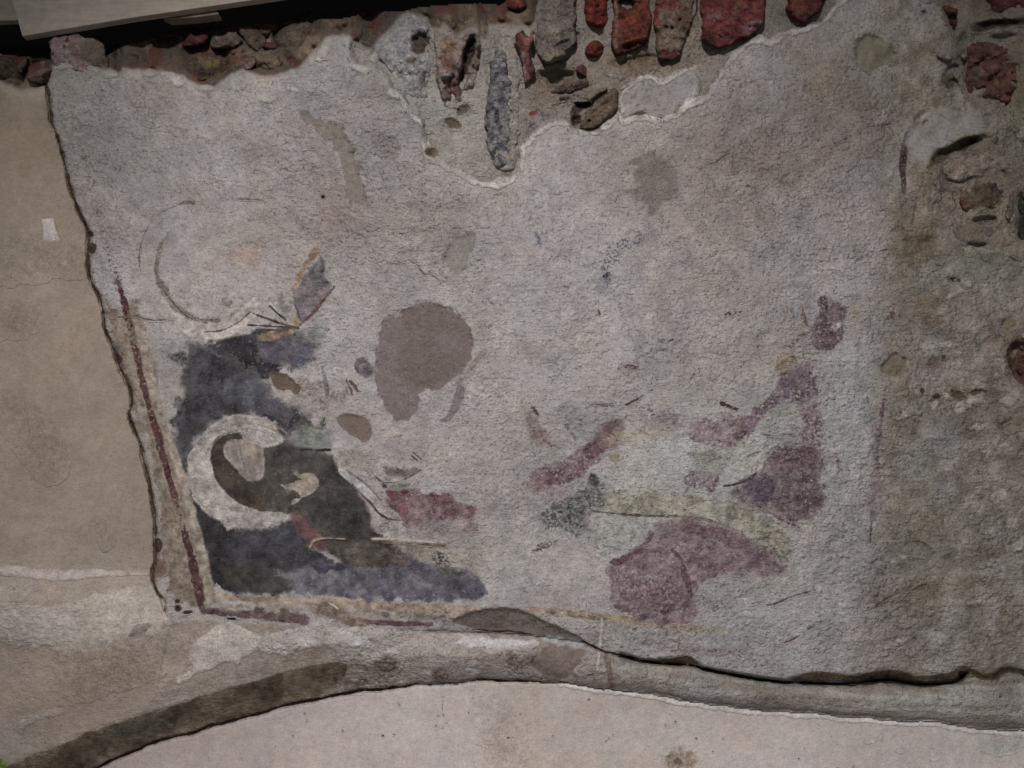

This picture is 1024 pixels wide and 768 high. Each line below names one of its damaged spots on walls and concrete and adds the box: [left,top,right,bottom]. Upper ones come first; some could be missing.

spalling [101,68,118,78]
spalling [141,67,215,91]
spalling [314,44,331,62]
flaking render [351,0,849,190]
flaking render [936,0,1024,105]
flaking render [924,132,1024,263]
crack [581,639,1024,689]